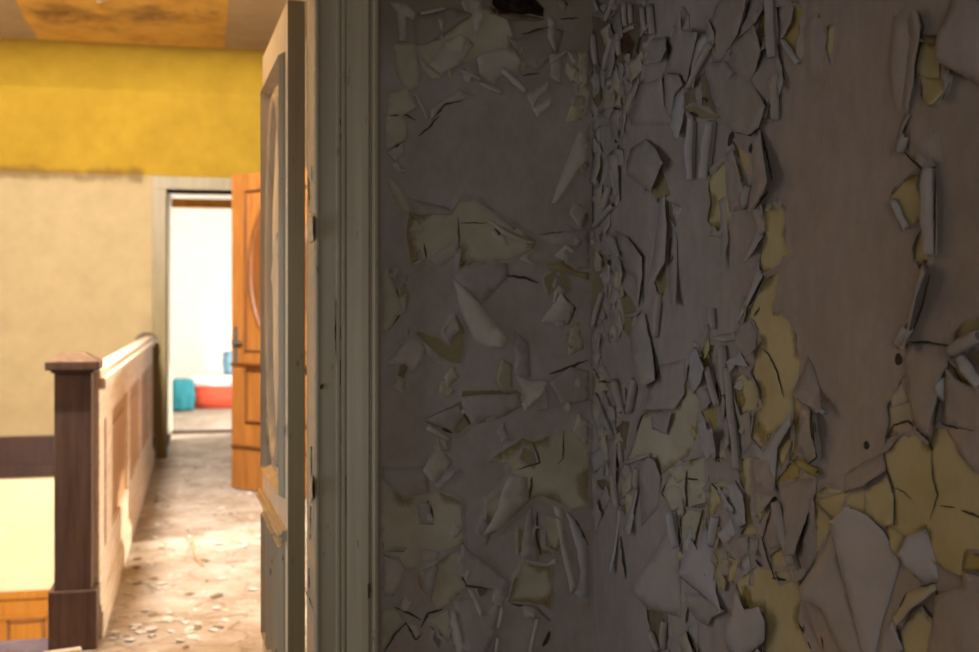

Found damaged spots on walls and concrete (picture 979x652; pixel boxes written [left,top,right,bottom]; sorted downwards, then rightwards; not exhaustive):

peeling [16,0,228,48]
peeling [381,0,979,652]